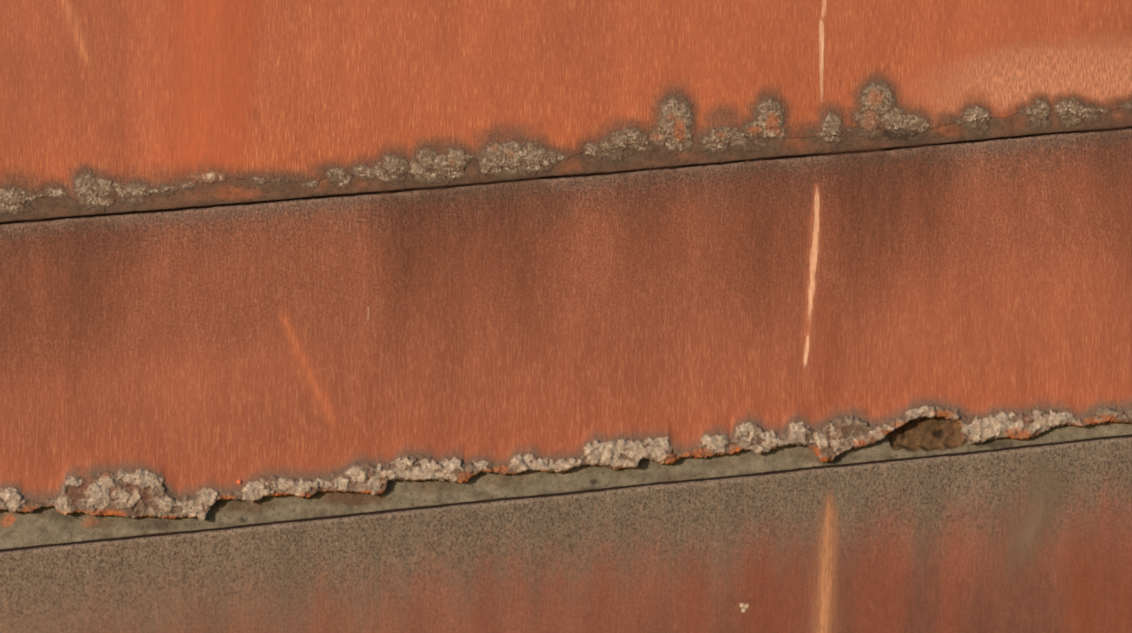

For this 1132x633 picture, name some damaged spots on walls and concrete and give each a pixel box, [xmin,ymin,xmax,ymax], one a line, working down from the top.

rust [648,93,694,154]
rust [727,97,787,152]
rust [810,79,913,146]
spalling [0,404,1132,521]
rust [816,502,833,633]